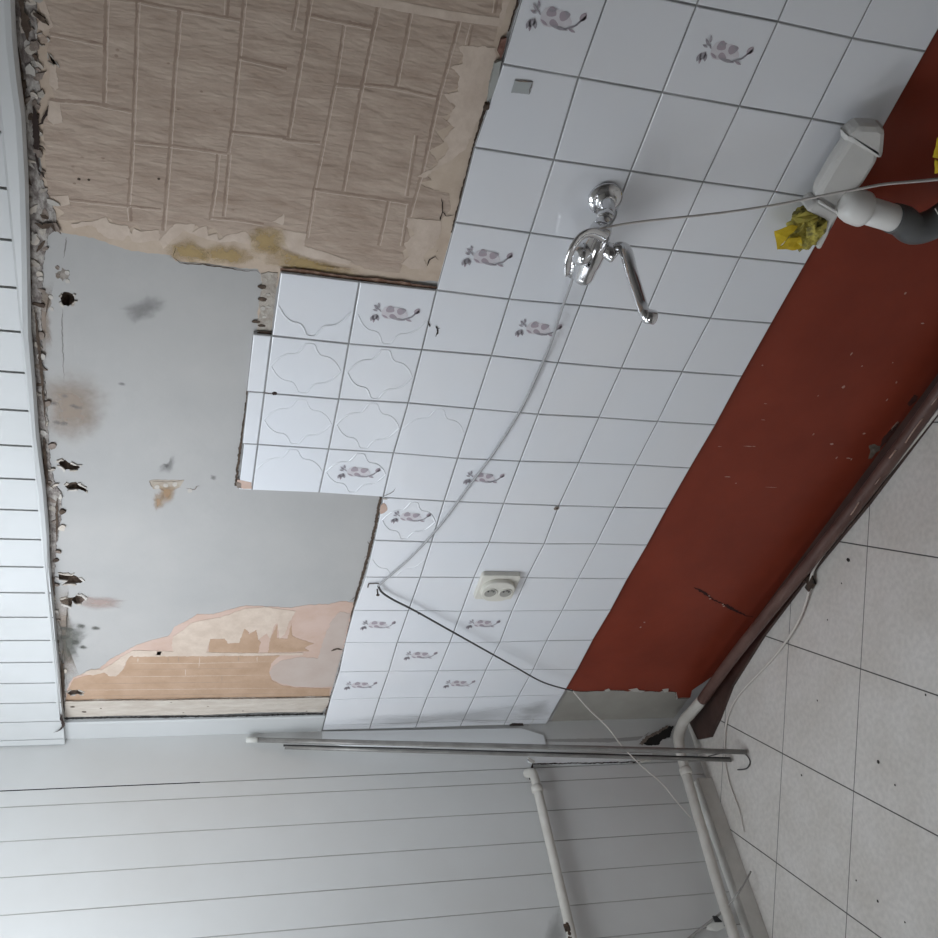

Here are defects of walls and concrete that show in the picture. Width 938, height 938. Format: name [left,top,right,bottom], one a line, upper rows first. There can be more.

spalling [483,37,507,111]
flaking render [15,0,329,720]
crack [694,587,752,617]